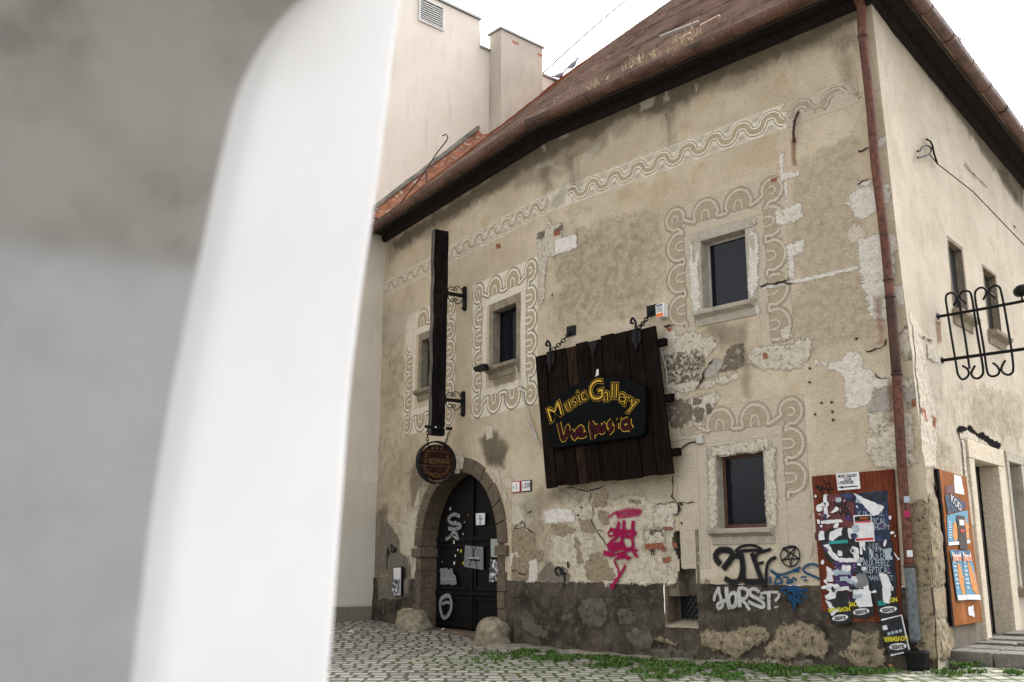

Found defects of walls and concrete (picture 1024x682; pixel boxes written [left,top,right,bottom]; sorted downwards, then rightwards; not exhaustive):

spalling [844,180,892,220]
spalling [536,216,575,305]
crack [759,266,859,290]
spalling [857,233,904,321]
spalling [659,238,828,429]
peeling [397,484,428,566]
peeling [490,468,682,587]
crack [568,485,606,545]
spalling [910,493,946,587]
flaking render [625,621,888,669]
spalling [916,614,955,662]